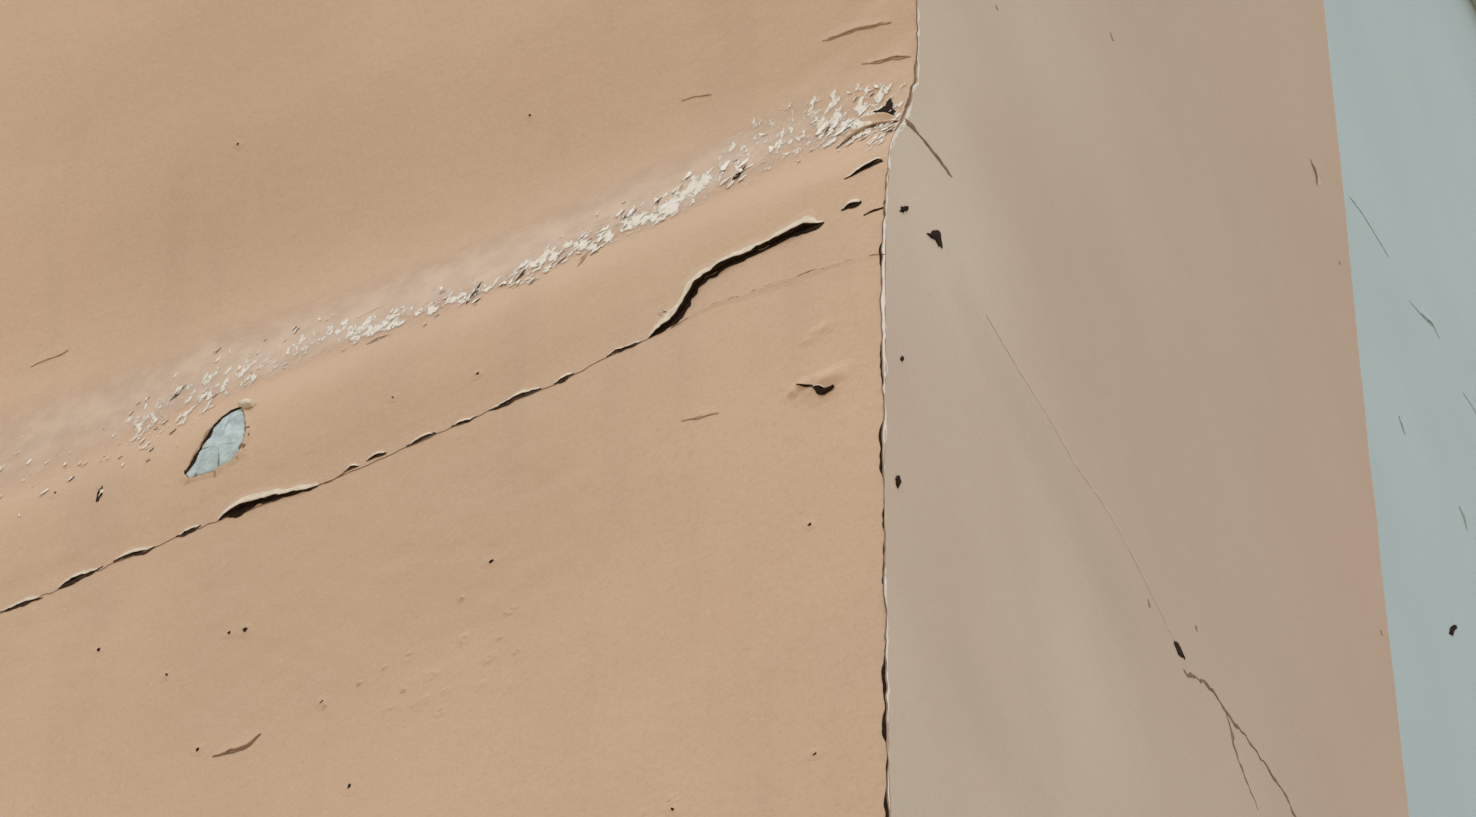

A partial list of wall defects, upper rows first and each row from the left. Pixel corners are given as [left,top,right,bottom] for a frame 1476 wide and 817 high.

peeling [0,5,920,817]
crack [0,118,952,613]
crack [986,316,1296,817]